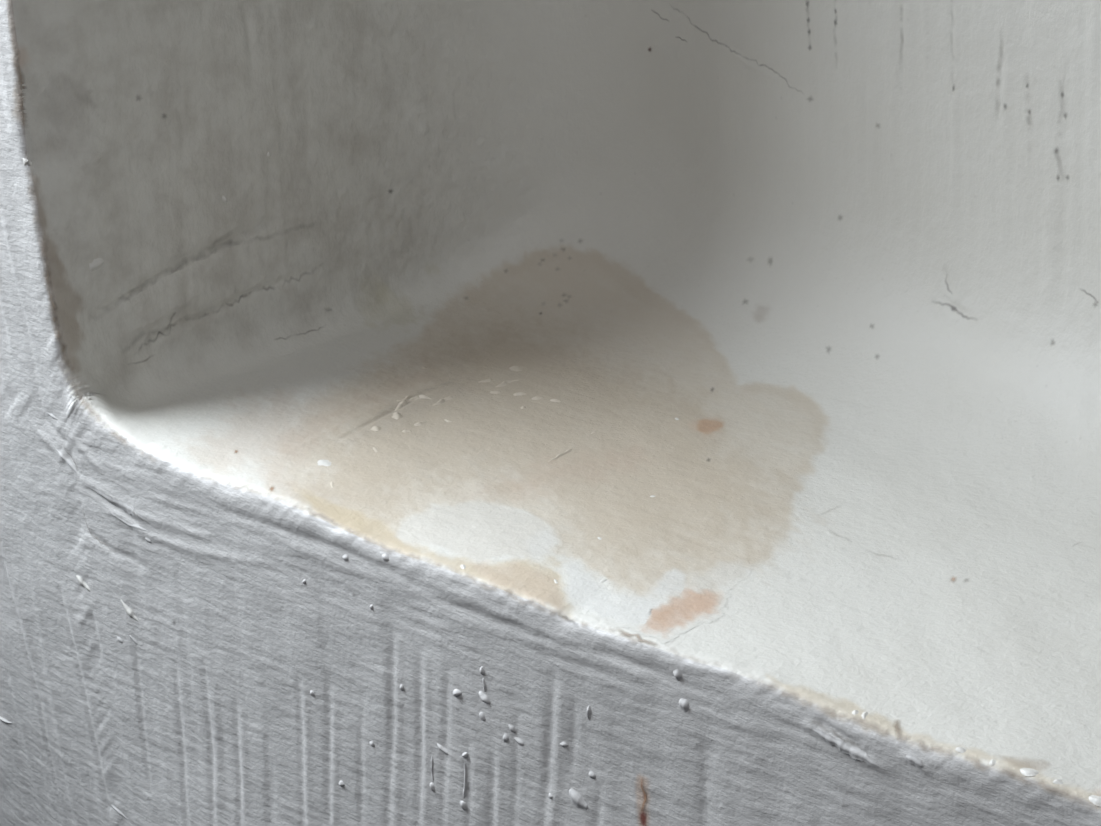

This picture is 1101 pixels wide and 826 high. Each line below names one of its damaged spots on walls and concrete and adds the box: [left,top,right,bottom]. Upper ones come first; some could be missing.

peeling [46,269,65,353]
damp [158,238,843,622]
peeling [556,554,753,629]
rust [632,769,654,826]
peeling [1020,768,1039,776]
peeling [1089,795,1101,807]